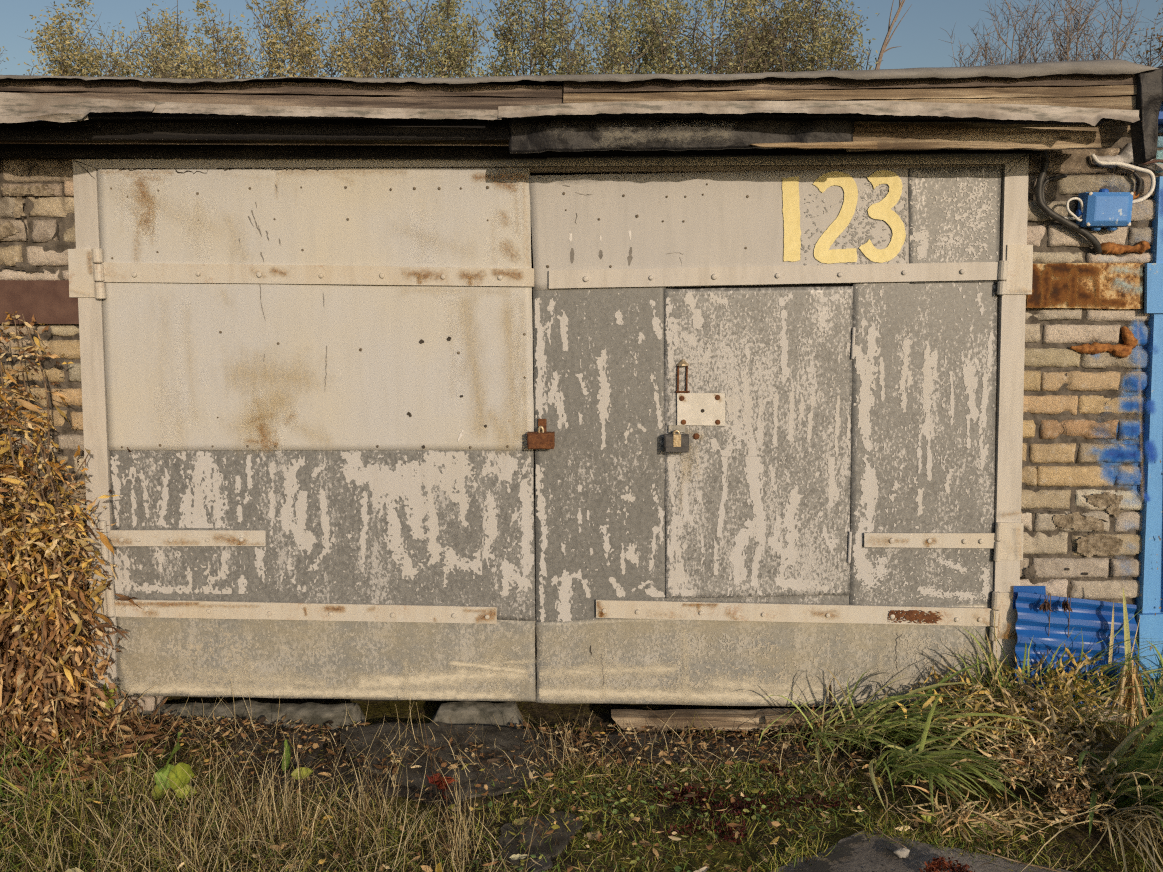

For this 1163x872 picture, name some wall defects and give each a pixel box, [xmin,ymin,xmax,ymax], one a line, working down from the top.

spalling [0,184,55,239]
corrosion [1027,263,1127,308]
peeling [110,282,996,702]